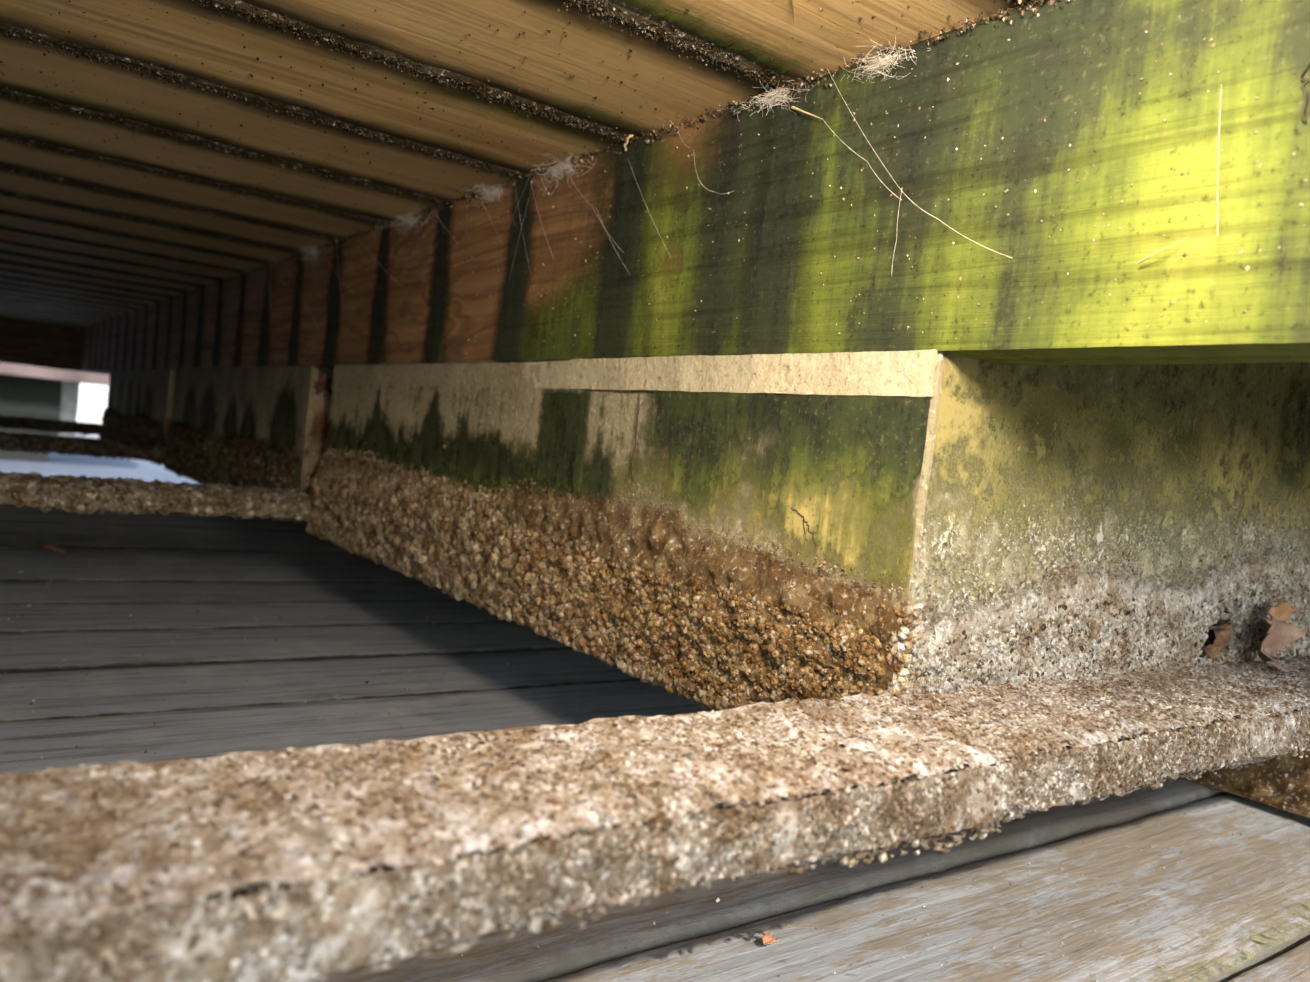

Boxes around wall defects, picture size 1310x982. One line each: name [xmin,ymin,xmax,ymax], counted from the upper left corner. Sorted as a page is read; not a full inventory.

water stain [586,136,649,358]
water stain [727,80,813,354]
water stain [332,388,614,501]
water stain [1275,374,1310,490]
water stain [921,503,1307,583]